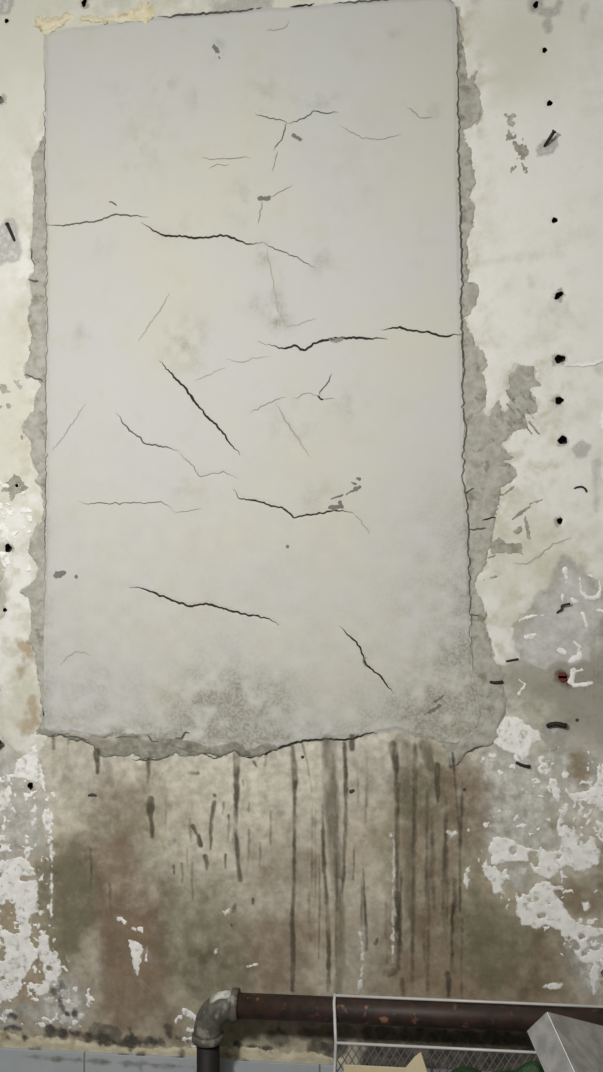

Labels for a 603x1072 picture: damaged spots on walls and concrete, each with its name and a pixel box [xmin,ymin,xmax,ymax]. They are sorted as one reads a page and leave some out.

crack [26,0,496,661]
peeling [0,136,95,1029]
crack [342,628,392,691]
spalling [455,7,603,995]
water stain [45,838,174,1056]
water stain [191,794,216,864]
water stain [224,834,241,879]
water stain [228,766,239,817]
water stain [246,831,302,991]
water stain [321,734,354,915]
water stain [376,741,475,997]
water stain [361,1027,540,1072]